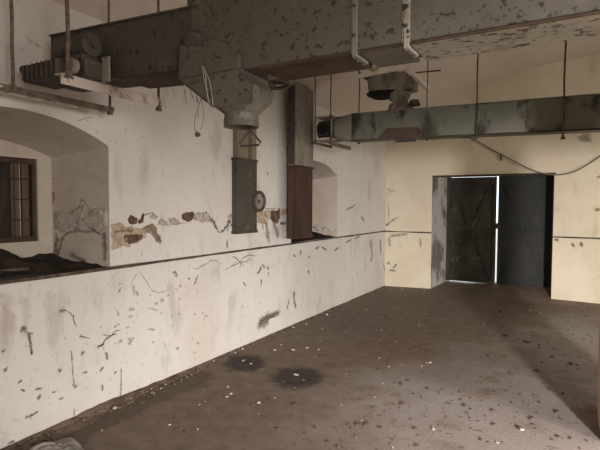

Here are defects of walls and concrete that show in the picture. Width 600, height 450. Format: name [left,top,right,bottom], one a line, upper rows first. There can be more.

flaking render [111,212,210,250]
flaking render [257,208,288,224]